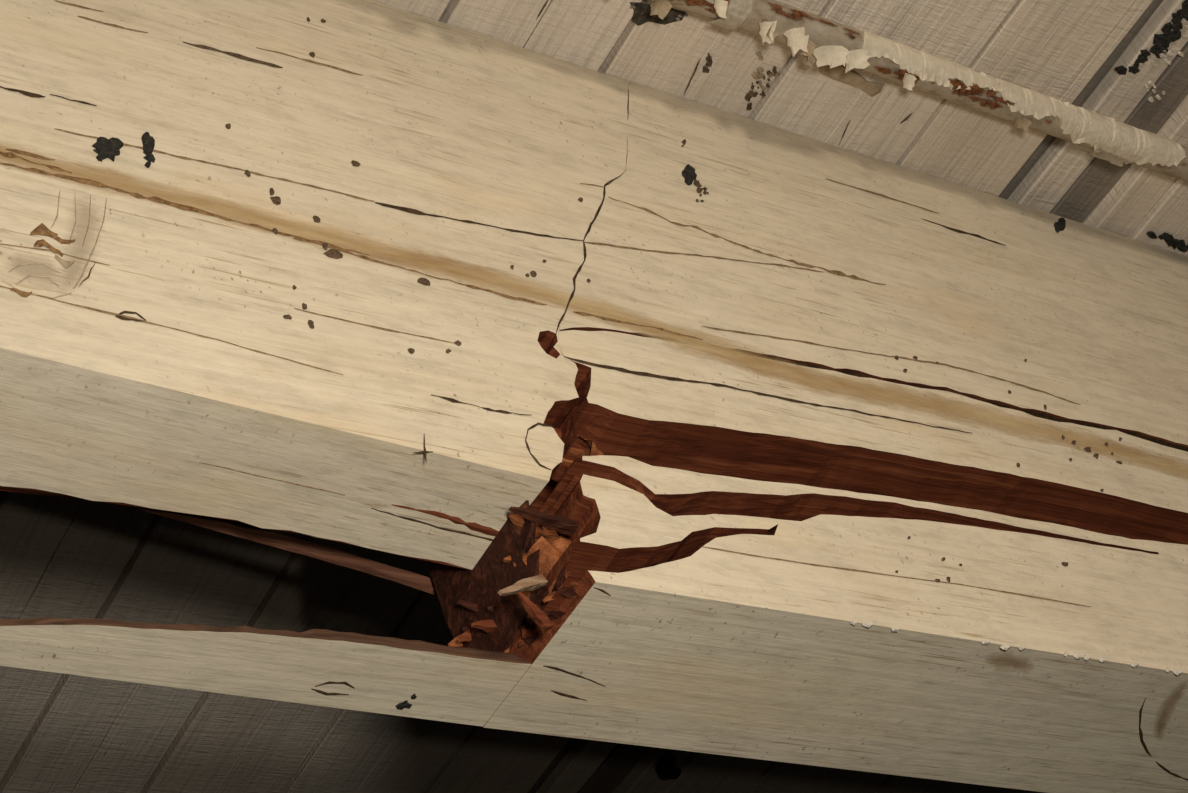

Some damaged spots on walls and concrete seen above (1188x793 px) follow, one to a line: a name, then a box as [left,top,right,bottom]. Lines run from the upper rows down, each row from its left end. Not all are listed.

peeling [630,0,688,26]
corrosion [671,0,730,14]
peeling [714,0,728,19]
corrosion [768,2,858,39]
peeling [745,20,885,110]
corrosion [949,79,1015,110]
damp [1115,0,1188,102]
crack [0,286,343,375]
crack [54,128,970,433]
damp [0,132,1188,475]
crack [703,326,1188,452]
crack [372,394,1188,701]